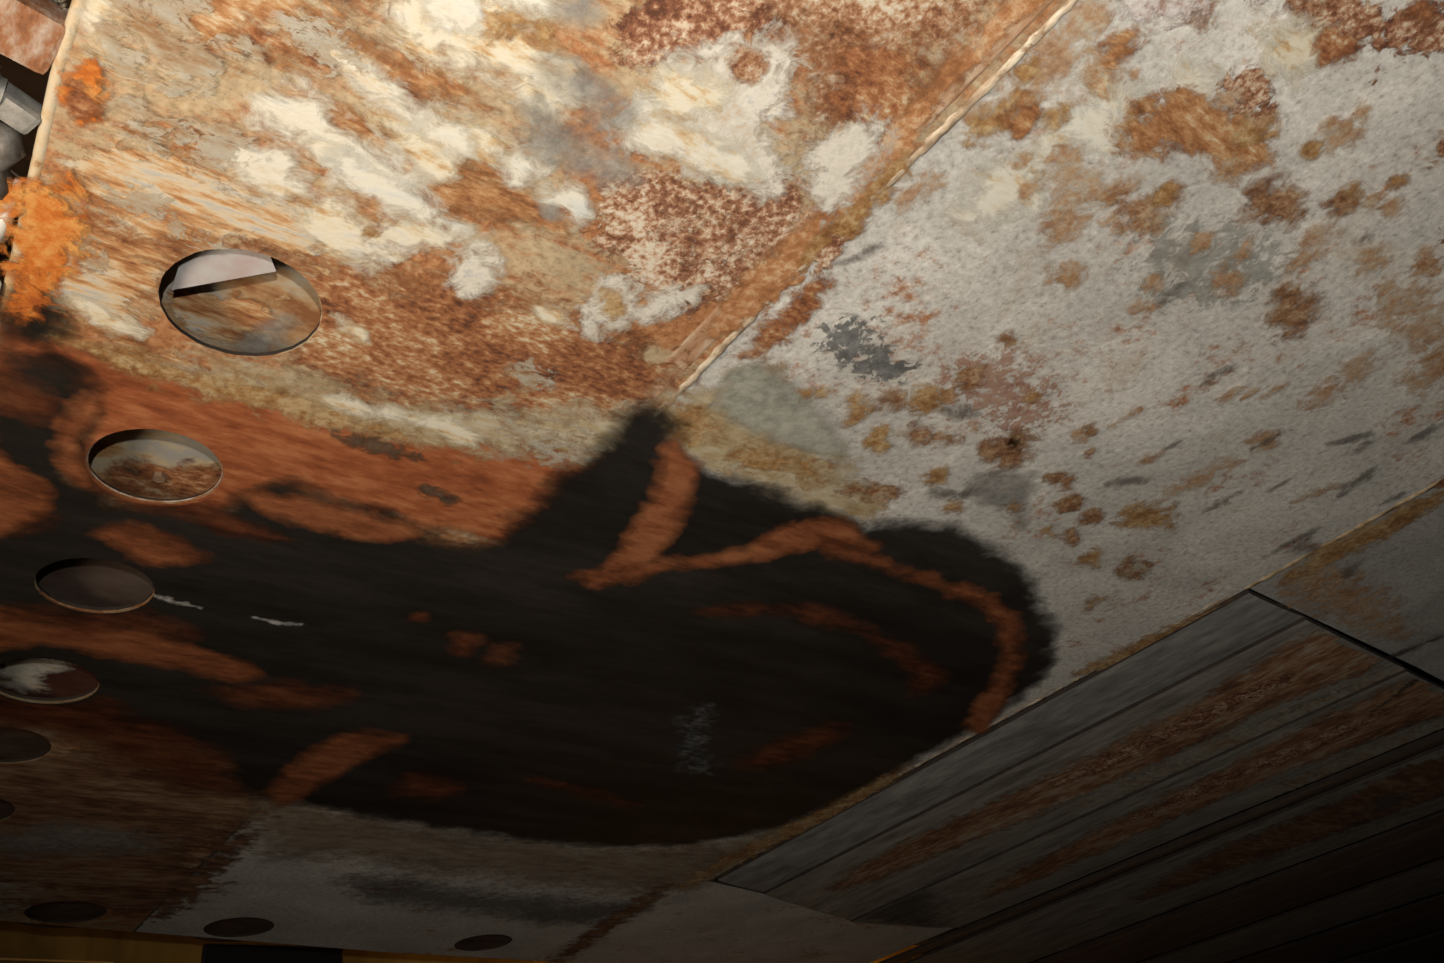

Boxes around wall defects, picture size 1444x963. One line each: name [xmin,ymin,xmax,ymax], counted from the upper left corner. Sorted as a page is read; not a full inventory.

corrosion [150,0,499,112]
corrosion [1284,0,1444,160]
corrosion [323,0,1185,360]
corrosion [1112,64,1408,339]
corrosion [0,120,695,541]
corrosion [844,331,1067,473]
leakage [0,454,51,535]
leakage [97,524,201,565]
leakage [166,323,1032,734]
leakage [0,607,348,707]
crack [1372,636,1442,712]
leakage [236,733,809,923]